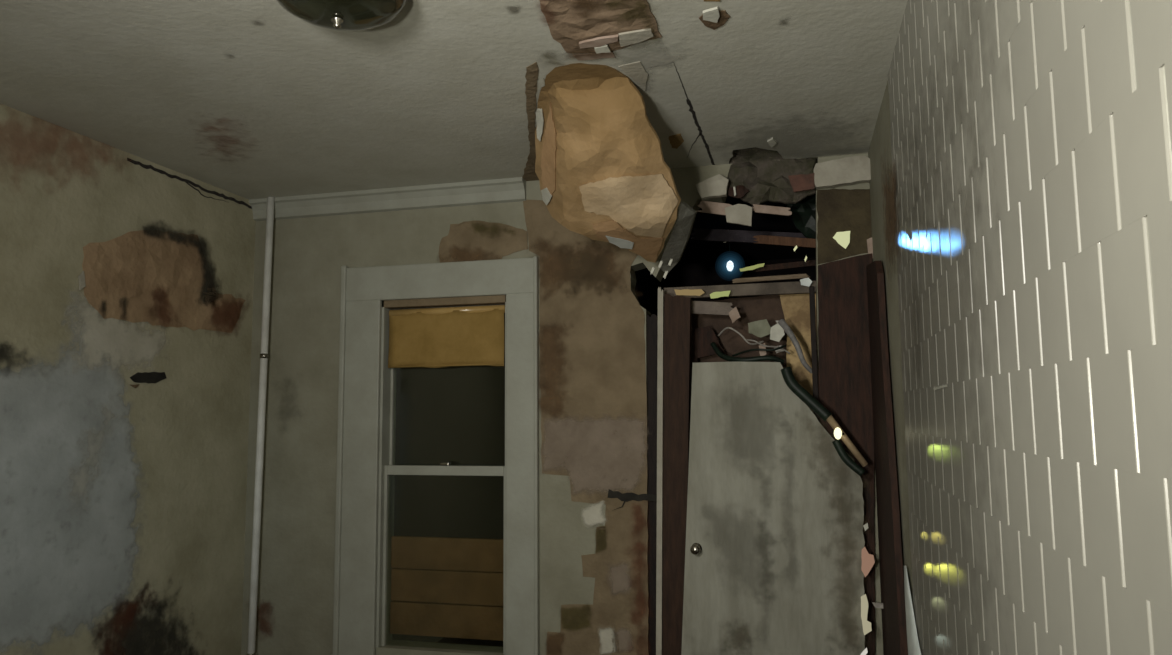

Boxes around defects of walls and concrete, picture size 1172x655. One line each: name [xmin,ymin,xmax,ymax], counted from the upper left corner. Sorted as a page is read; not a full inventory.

spalling [539,0,677,91]
spalling [699,0,730,30]
crack [649,62,715,165]
crack [127,158,252,209]
spalling [439,200,649,655]
damp [97,588,198,655]